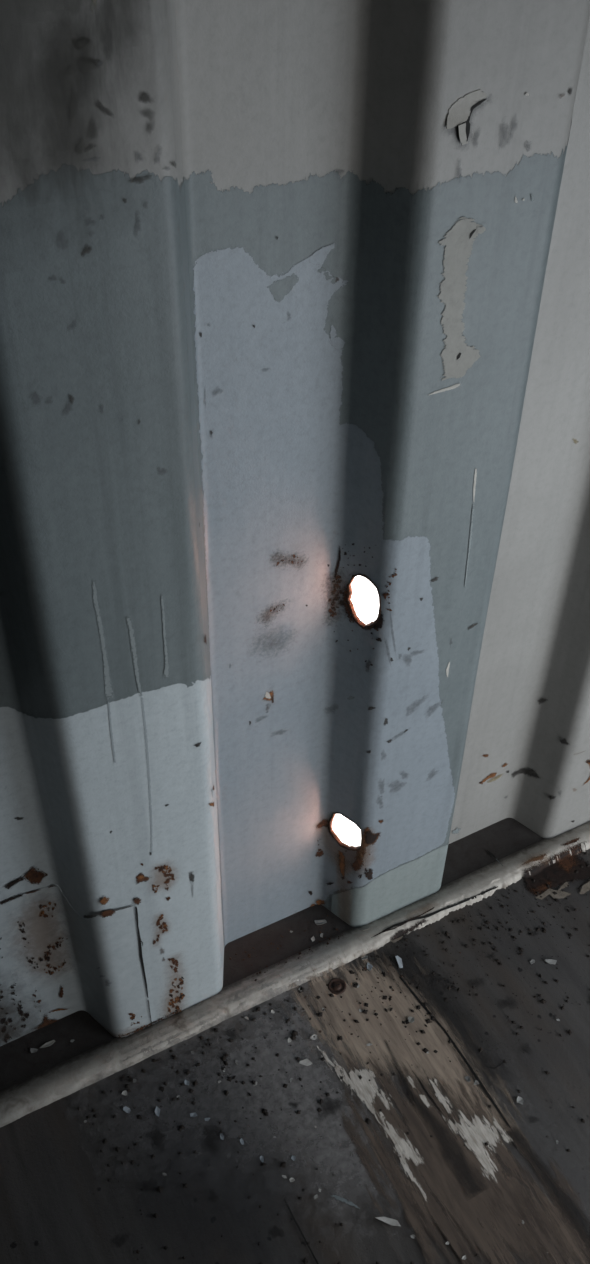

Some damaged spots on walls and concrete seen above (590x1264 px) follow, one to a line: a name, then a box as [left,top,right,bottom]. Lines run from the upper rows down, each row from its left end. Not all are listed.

peeling [446,89,487,145]
peeling [437,217,486,381]
corrosion [328,543,397,666]
corrosion [316,819,329,857]
corrosion [326,827,380,885]
corrosion [0,867,57,918]
corrosion [17,921,68,975]
crack [84,896,152,1025]
corrosion [116,863,185,1038]
corrosion [0,983,68,1045]